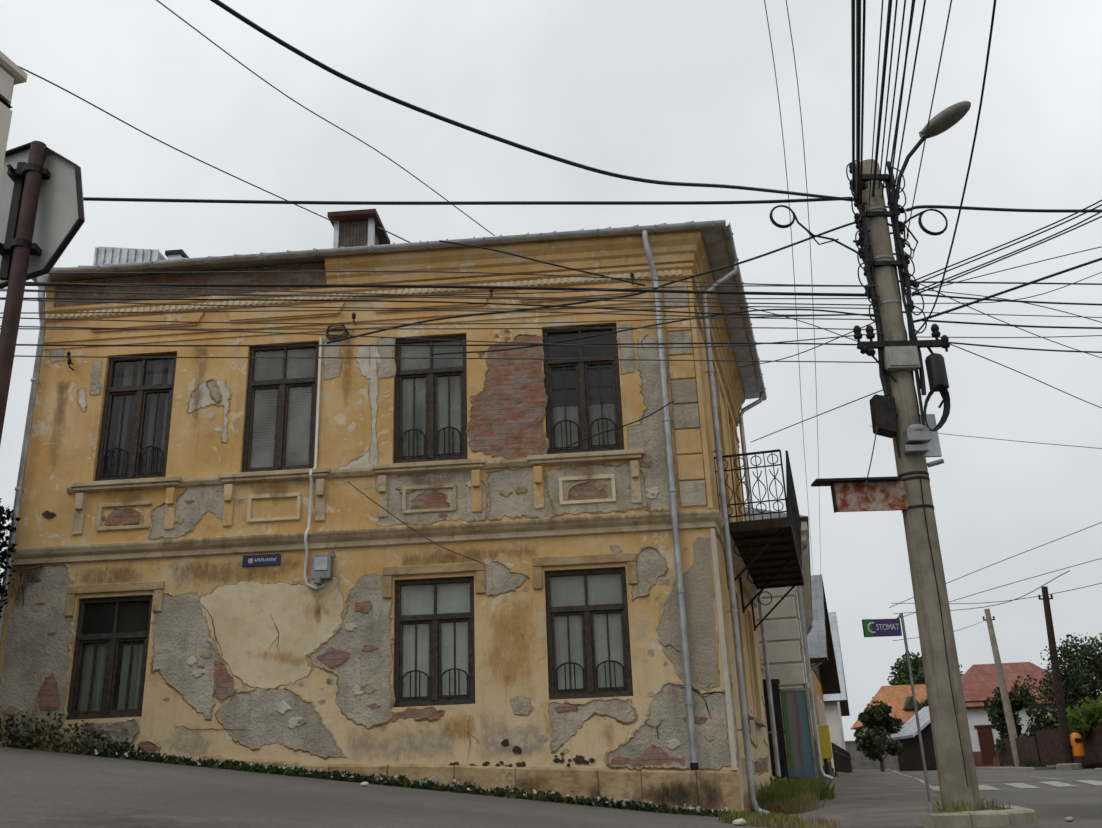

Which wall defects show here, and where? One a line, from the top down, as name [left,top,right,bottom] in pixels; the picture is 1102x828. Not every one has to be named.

peeling [187,378,232,444]
flaking render [322,323,680,527]
flaking render [484,560,530,602]
flaking render [0,563,76,748]
peeling [150,573,446,760]
flaking render [537,536,769,776]
flaking render [71,717,162,757]
peeling [449,739,526,767]
flaking render [509,696,534,716]